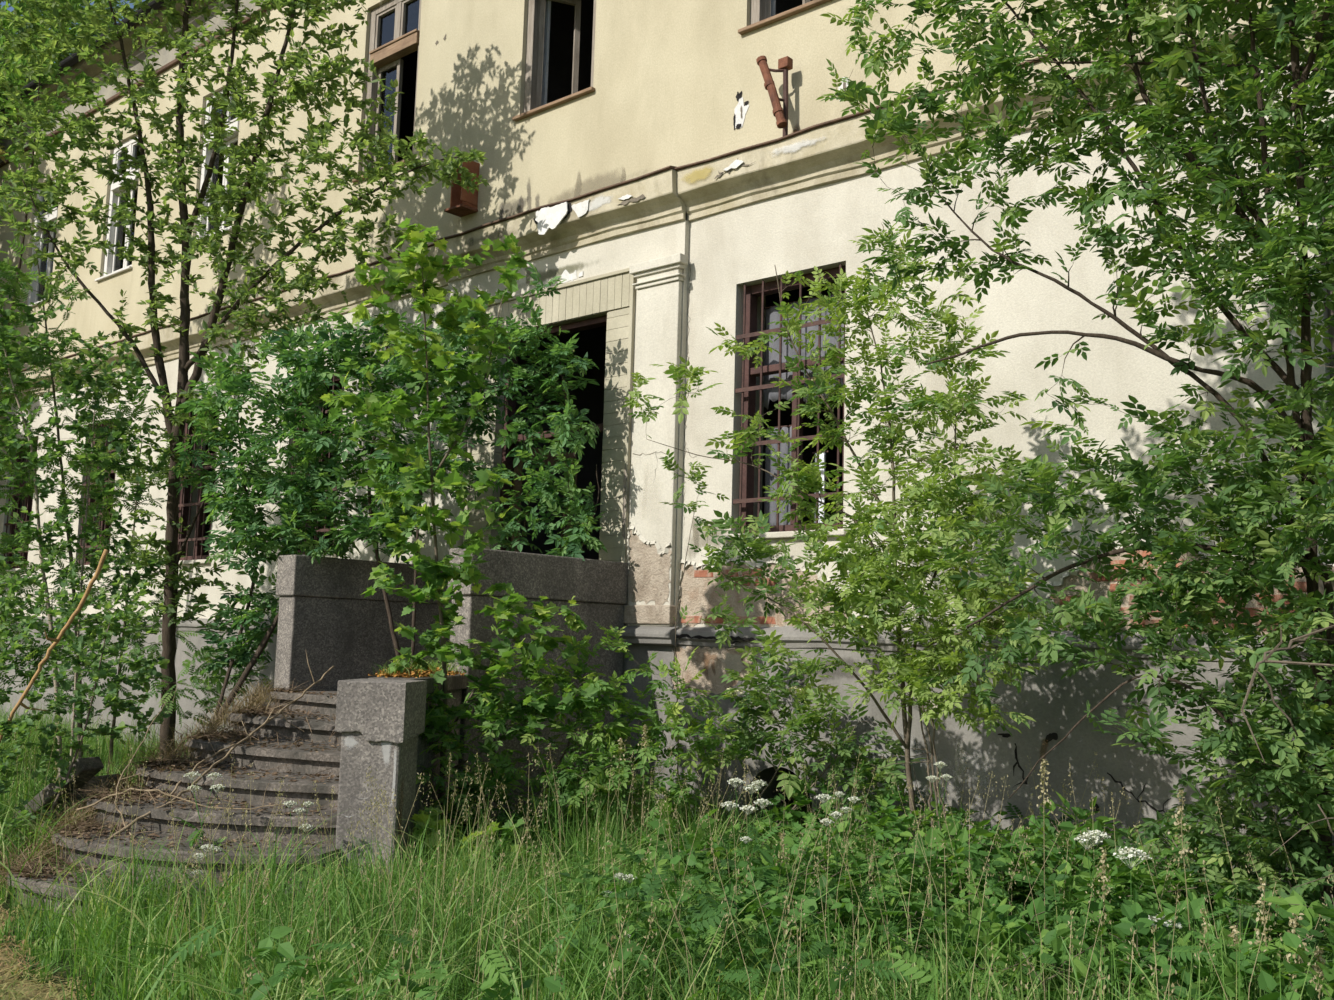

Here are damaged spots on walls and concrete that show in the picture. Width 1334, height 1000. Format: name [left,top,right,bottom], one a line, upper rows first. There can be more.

spalling [733,91,749,130]
peeling [533,199,590,235]
peeling [618,194,645,205]
flaking render [622,463,848,628]
peeling [669,646,757,700]
crack [1013,743,1028,786]
crack [1107,772,1171,815]